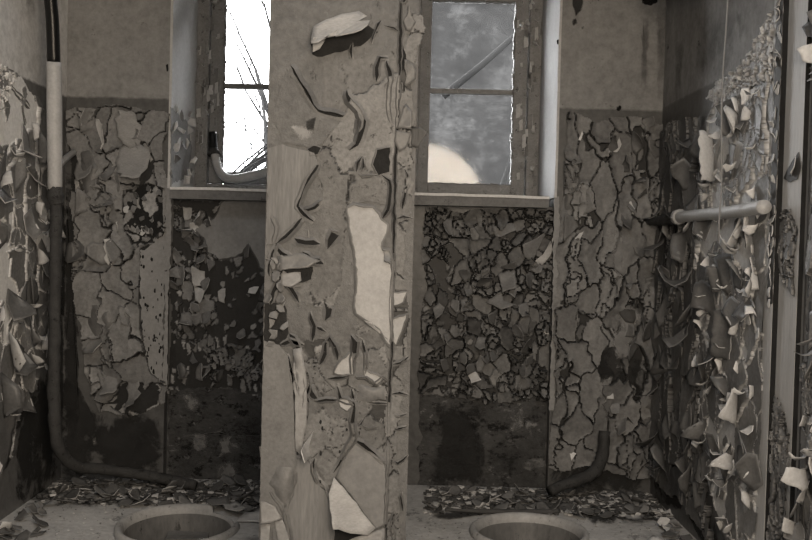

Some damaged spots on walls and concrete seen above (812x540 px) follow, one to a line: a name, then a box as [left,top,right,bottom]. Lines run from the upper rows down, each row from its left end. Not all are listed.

peeling [0,64,50,476]
peeling [62,0,426,540]
peeling [416,0,812,540]